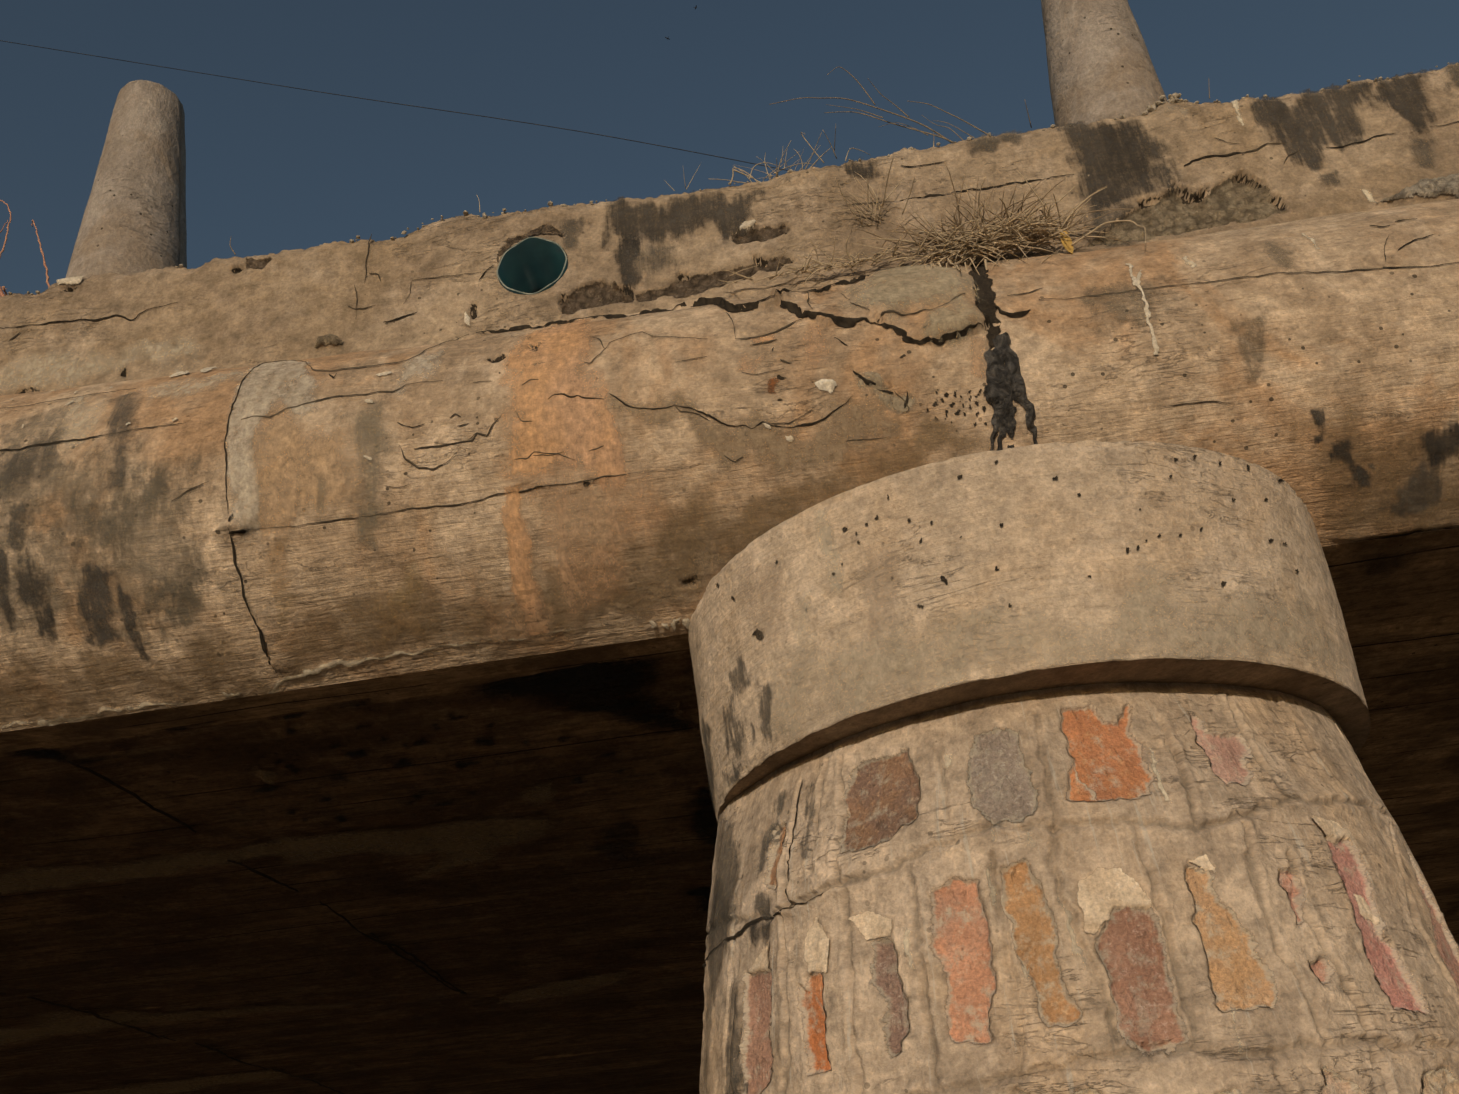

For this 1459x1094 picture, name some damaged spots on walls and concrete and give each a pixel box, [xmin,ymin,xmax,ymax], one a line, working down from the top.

water stain [602,190,764,299]
water stain [1059,121,1178,246]
water stain [1232,70,1435,184]
crack [3,388,136,408]
rust [502,319,630,640]
crack [172,218,1459,676]
water stain [77,564,148,660]
peeling [839,749,920,853]
peeling [1061,703,1155,802]
crack [702,783,823,969]
peeling [797,916,832,1076]
peeling [1077,867,1190,1056]